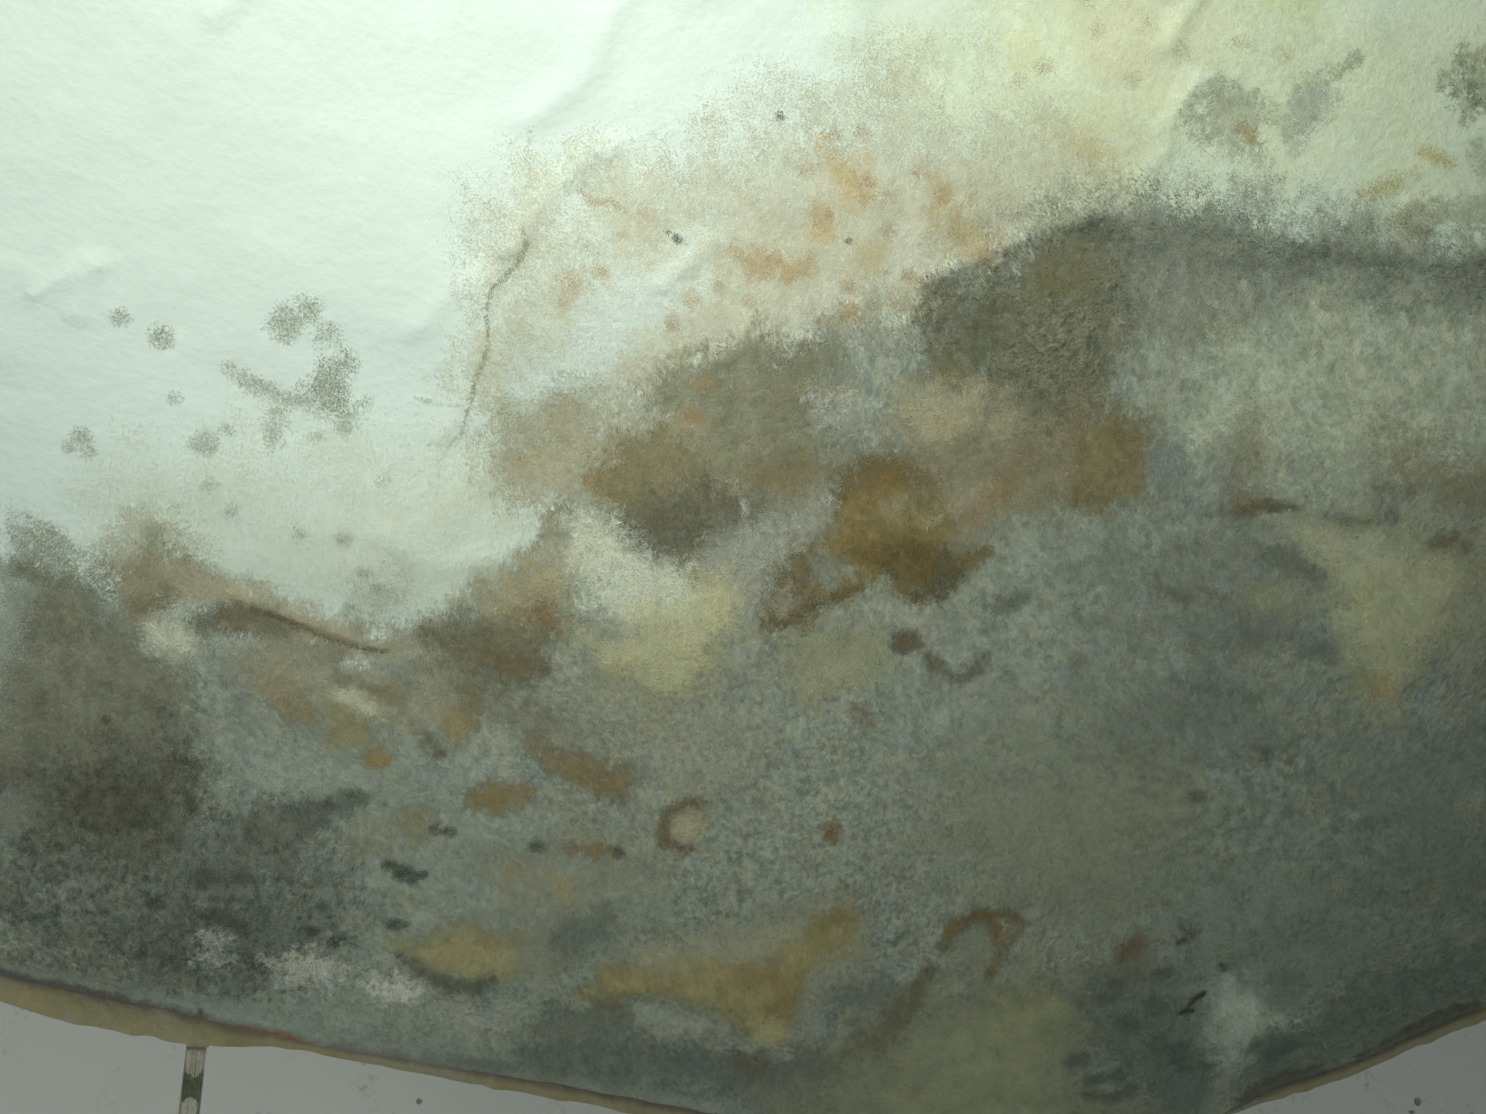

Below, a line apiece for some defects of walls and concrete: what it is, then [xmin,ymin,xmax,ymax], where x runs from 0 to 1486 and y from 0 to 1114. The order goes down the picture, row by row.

leakage [108,307,177,350]
crack [412,126,533,493]
leakage [176,1050,206,1114]